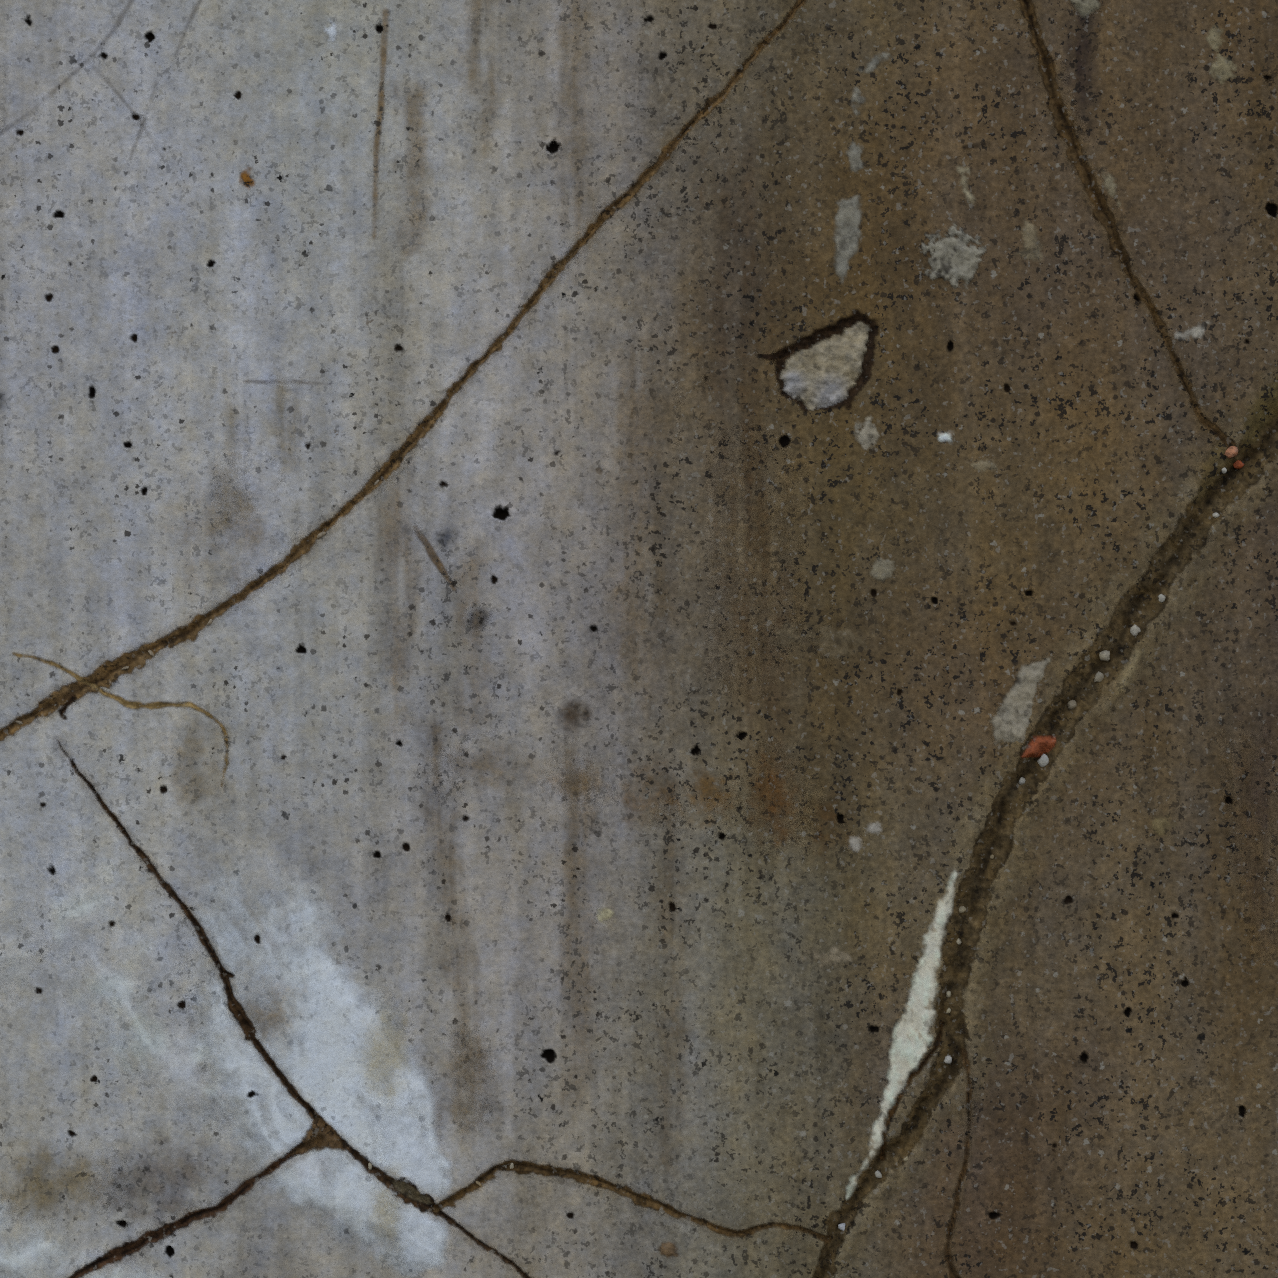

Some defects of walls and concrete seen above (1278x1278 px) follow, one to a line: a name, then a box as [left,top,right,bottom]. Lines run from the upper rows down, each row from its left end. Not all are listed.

crack [0,0,805,785]
spalling [758,310,878,412]
spalling [855,417,879,450]
crack [792,0,1278,1278]
crack [69,759,832,1278]